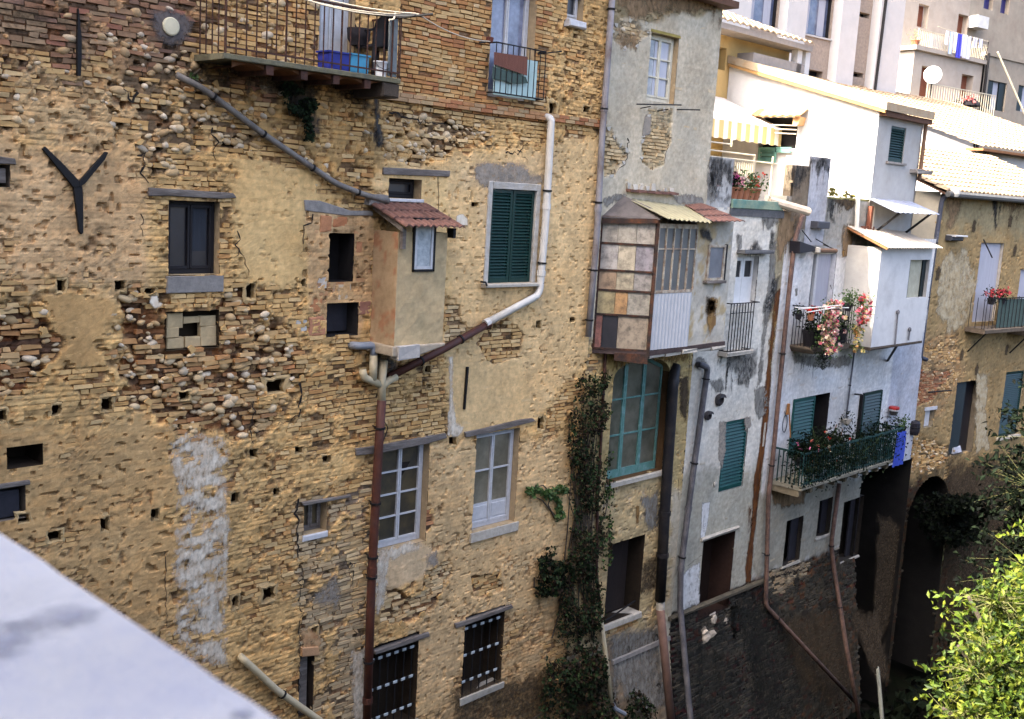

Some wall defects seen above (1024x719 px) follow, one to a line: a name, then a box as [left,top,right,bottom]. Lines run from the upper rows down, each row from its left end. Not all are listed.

flaking render [604,107,674,178]
spalling [477,317,524,363]
leakage [654,209,800,430]
corrosion [745,289,781,583]
efflorescence [173,435,229,665]
crack [293,499,304,690]